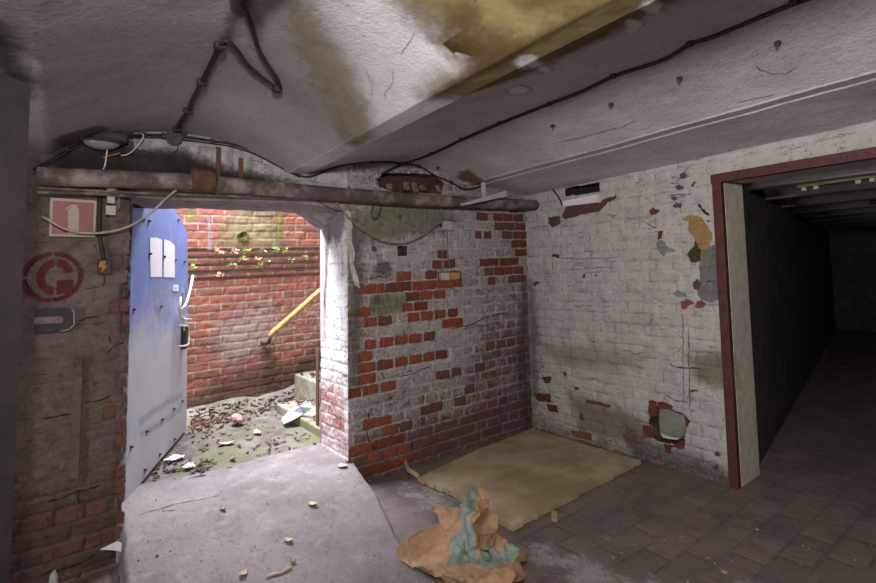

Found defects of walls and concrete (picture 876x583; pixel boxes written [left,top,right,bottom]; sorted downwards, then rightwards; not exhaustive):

water stain [404,0,673,98]
spalling [376,173,444,194]
flaking render [548,182,617,227]
flaking render [672,172,712,250]
peeling [475,210,539,286]
peeling [656,231,675,256]
peeling [346,210,463,399]
peeling [673,279,706,309]
peeling [455,384,475,407]
peeling [533,377,558,413]
peeling [350,408,496,477]
spalling [622,400,691,454]